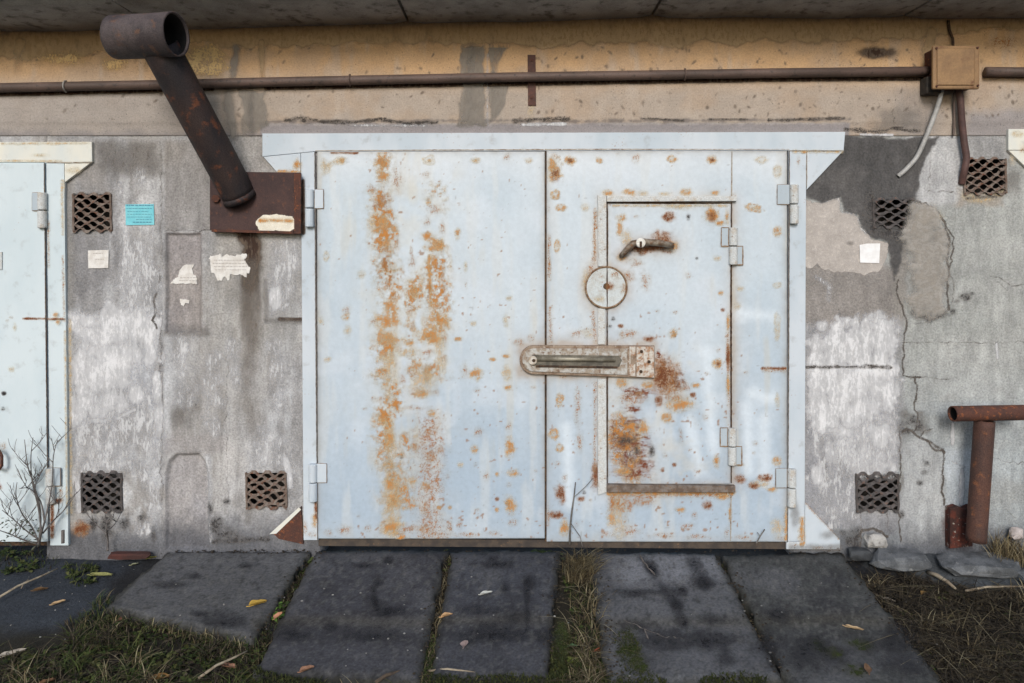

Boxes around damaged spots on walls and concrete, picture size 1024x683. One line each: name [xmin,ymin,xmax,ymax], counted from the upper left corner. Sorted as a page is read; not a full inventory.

leakage [0,30,105,64]
leakage [188,10,1024,139]
corrosion [277,160,305,235]
corrosion [549,157,575,212]
corrosion [706,191,729,225]
peeling [806,198,888,289]
corrosion [358,152,476,539]
crack [858,177,955,547]
corrosion [577,309,775,539]
corrosion [547,478,577,532]